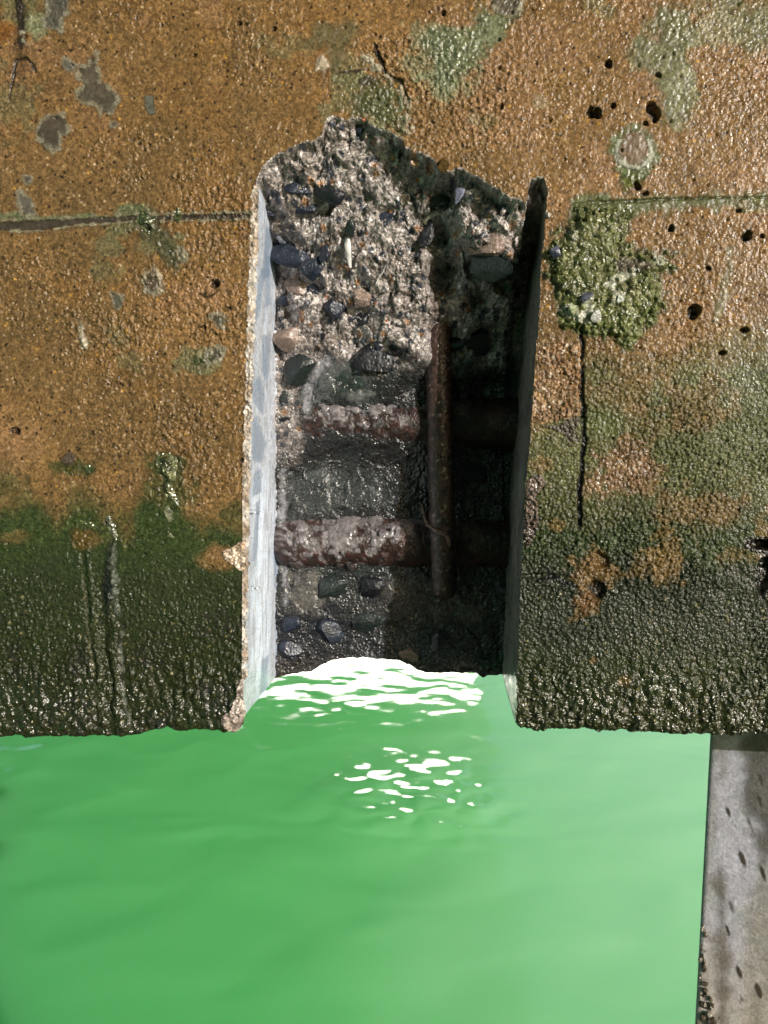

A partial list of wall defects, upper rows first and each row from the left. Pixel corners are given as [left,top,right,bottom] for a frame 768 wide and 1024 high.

crack [9,0,36,101]
spalling [221,115,548,732]
crack [577,332,587,529]
water stain [102,515,120,615]
water stain [83,579,101,722]
water stain [117,631,132,722]